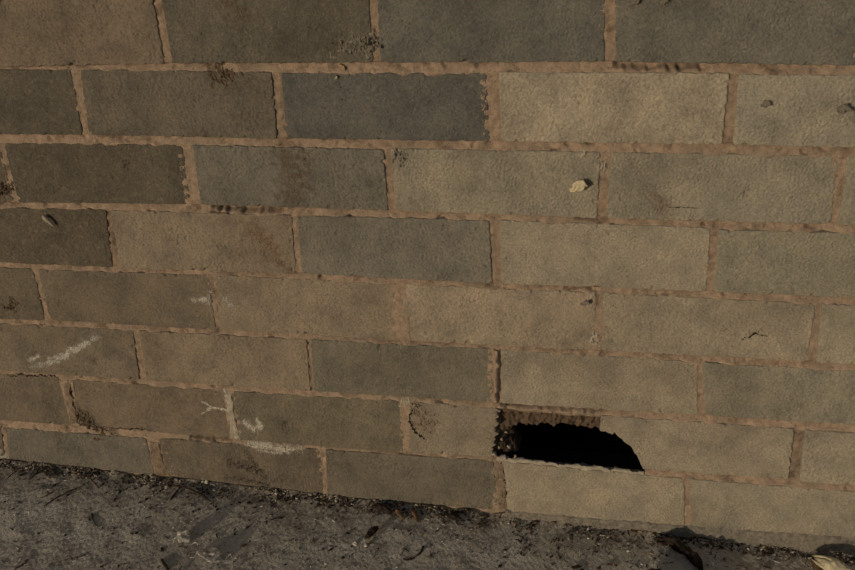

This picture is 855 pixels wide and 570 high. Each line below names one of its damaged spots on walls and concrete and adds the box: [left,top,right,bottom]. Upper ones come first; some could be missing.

spalling [493,410,645,511]